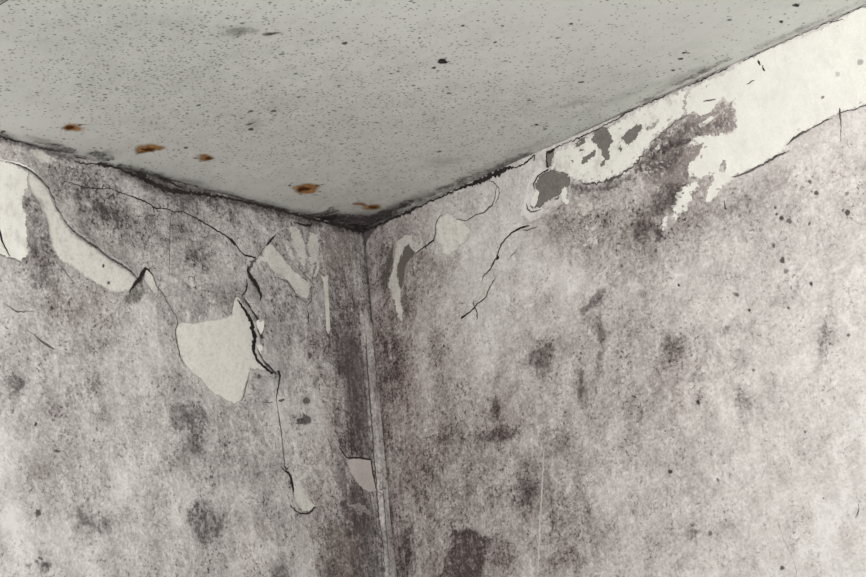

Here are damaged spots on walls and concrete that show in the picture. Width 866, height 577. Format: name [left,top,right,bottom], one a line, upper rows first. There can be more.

crack [0,136,59,152]
rust [136,144,163,154]
peeling [520,7,866,246]
rust [294,184,323,193]
peeling [0,141,159,304]
spalling [383,187,497,321]
crack [69,6,866,493]
crack [7,305,54,349]
spalling [171,226,319,404]
spalling [339,438,376,492]
leakage [439,522,490,577]